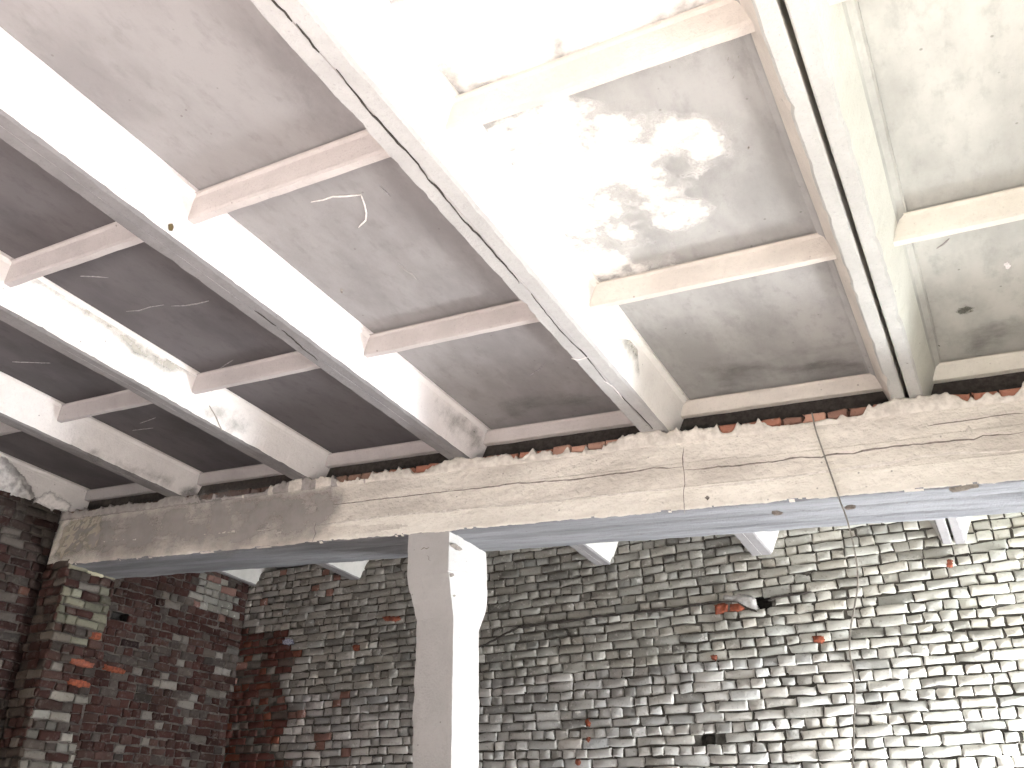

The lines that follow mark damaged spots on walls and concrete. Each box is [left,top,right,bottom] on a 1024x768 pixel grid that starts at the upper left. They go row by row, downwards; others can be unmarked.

crack [271,0,653,429]
damp [488,96,725,279]
crack [254,310,318,361]
crack [312,413,1023,542]